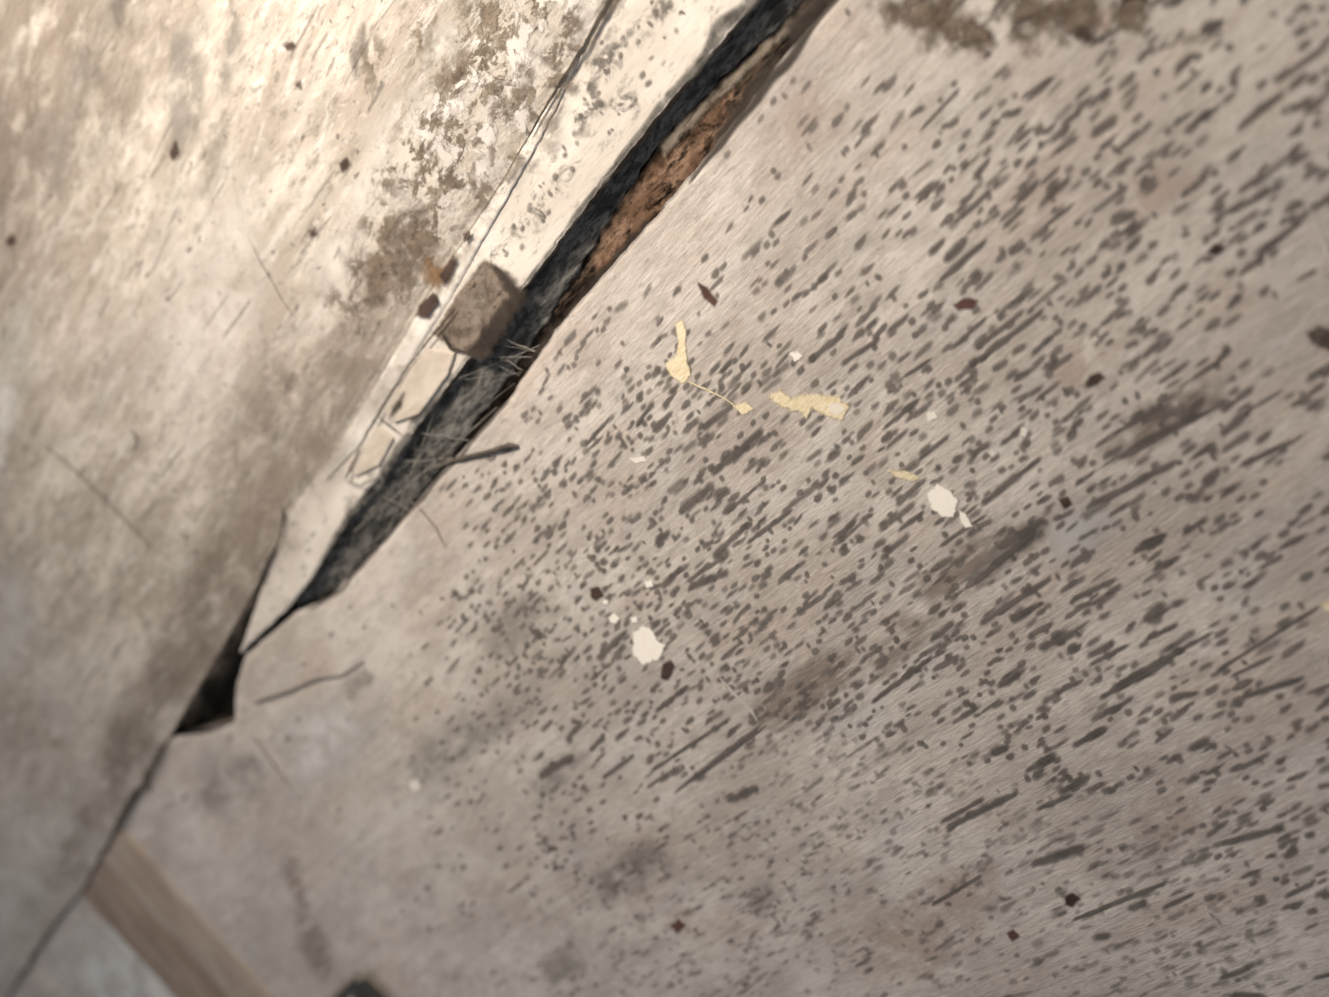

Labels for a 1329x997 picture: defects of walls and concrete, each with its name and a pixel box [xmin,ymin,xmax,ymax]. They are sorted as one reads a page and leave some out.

crack [252,246,292,313]
crack [272,0,837,632]
crack [259,509,284,580]
crack [7,745,165,997]